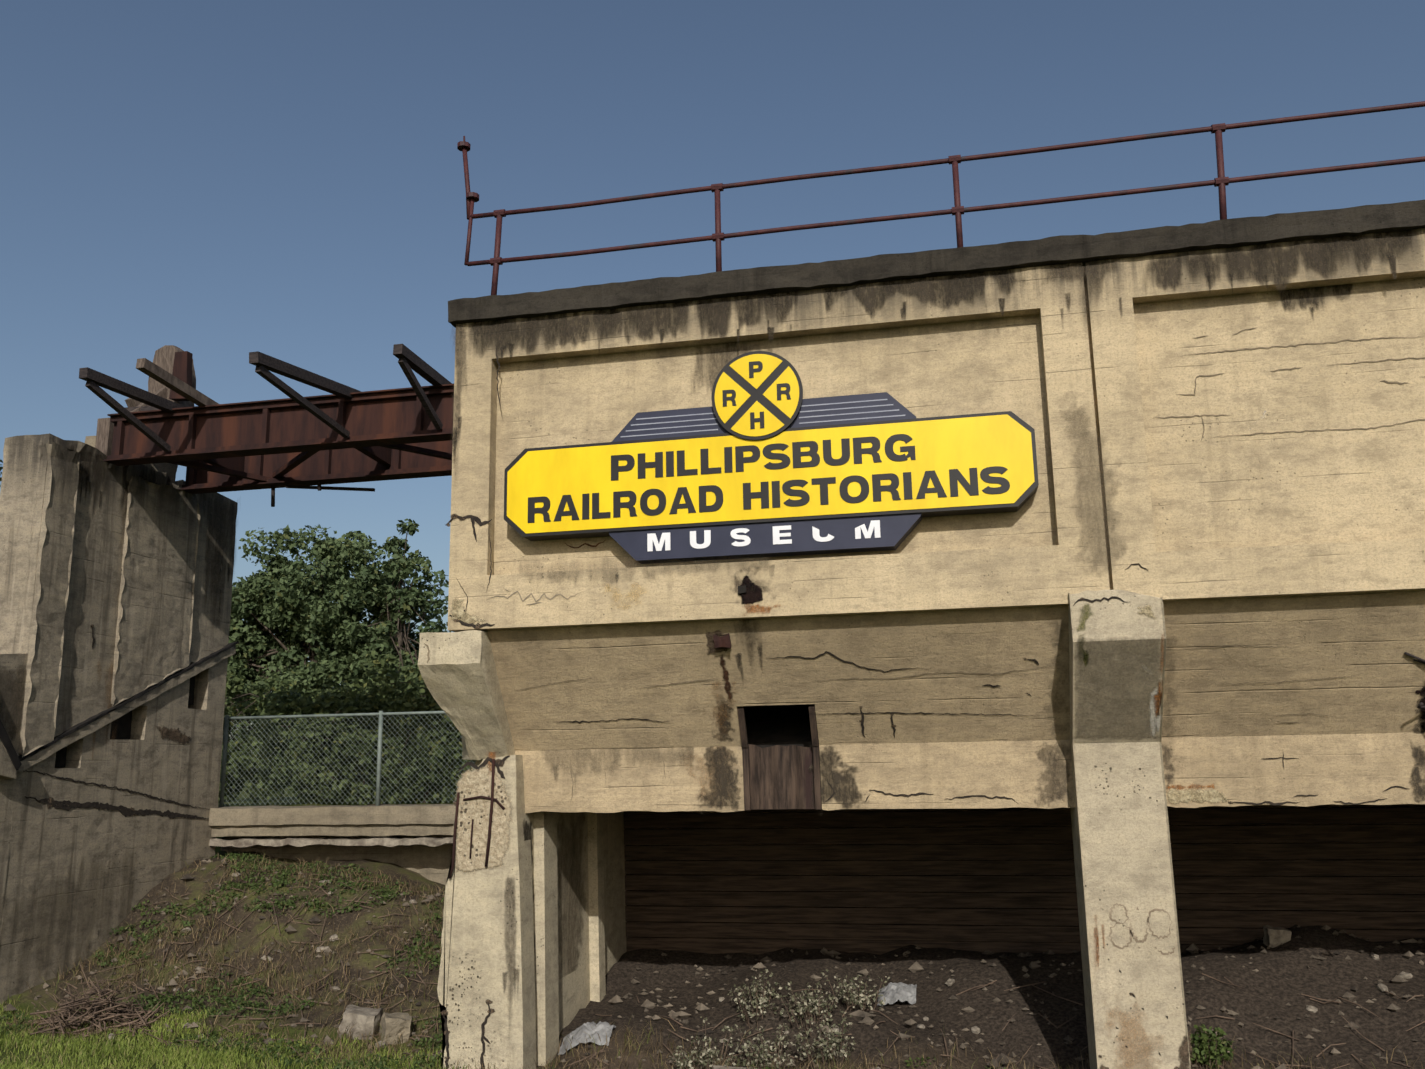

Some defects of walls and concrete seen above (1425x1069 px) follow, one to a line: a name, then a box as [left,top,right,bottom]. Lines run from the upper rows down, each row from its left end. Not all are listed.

water stain [1151,230,1411,313]
crack [446,514,572,629]
crack [1073,563,1148,606]
crack [553,678,718,724]
corrosion [720,656,732,700]
crack [769,651,1055,738]
spalling [1415,686,1425,731]
spalling [157,726,191,745]
crack [23,770,209,820]
spalling [449,759,512,879]
crack [825,779,1017,803]
crack [440,999,495,1069]